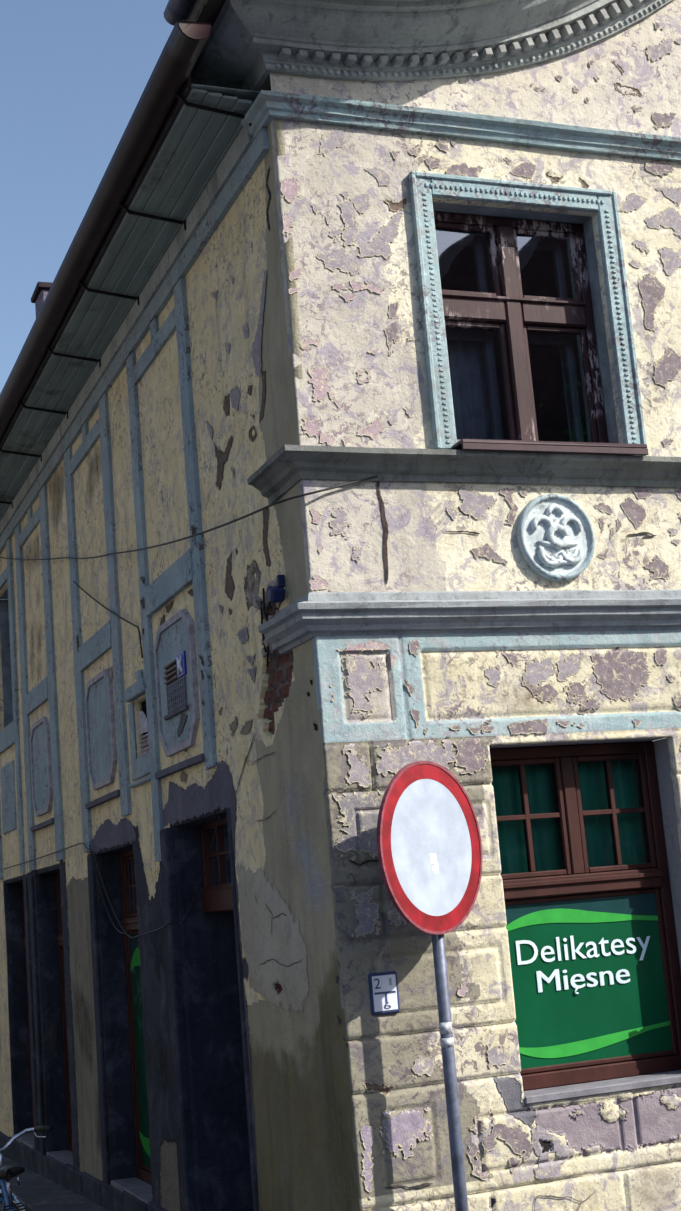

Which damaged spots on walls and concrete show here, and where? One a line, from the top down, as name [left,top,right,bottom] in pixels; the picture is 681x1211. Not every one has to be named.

crack [264,167,272,231]
peeling [280,177,301,236]
peeling [312,167,407,292]
peeling [504,157,563,183]
peeling [618,160,681,331]
peeling [654,346,681,388]
crack [374,481,389,584]
peeling [594,487,652,559]
flaking render [218,508,294,737]
crack [254,892,303,967]
flaking render [468,1044,681,1180]
crack [534,1192,595,1211]